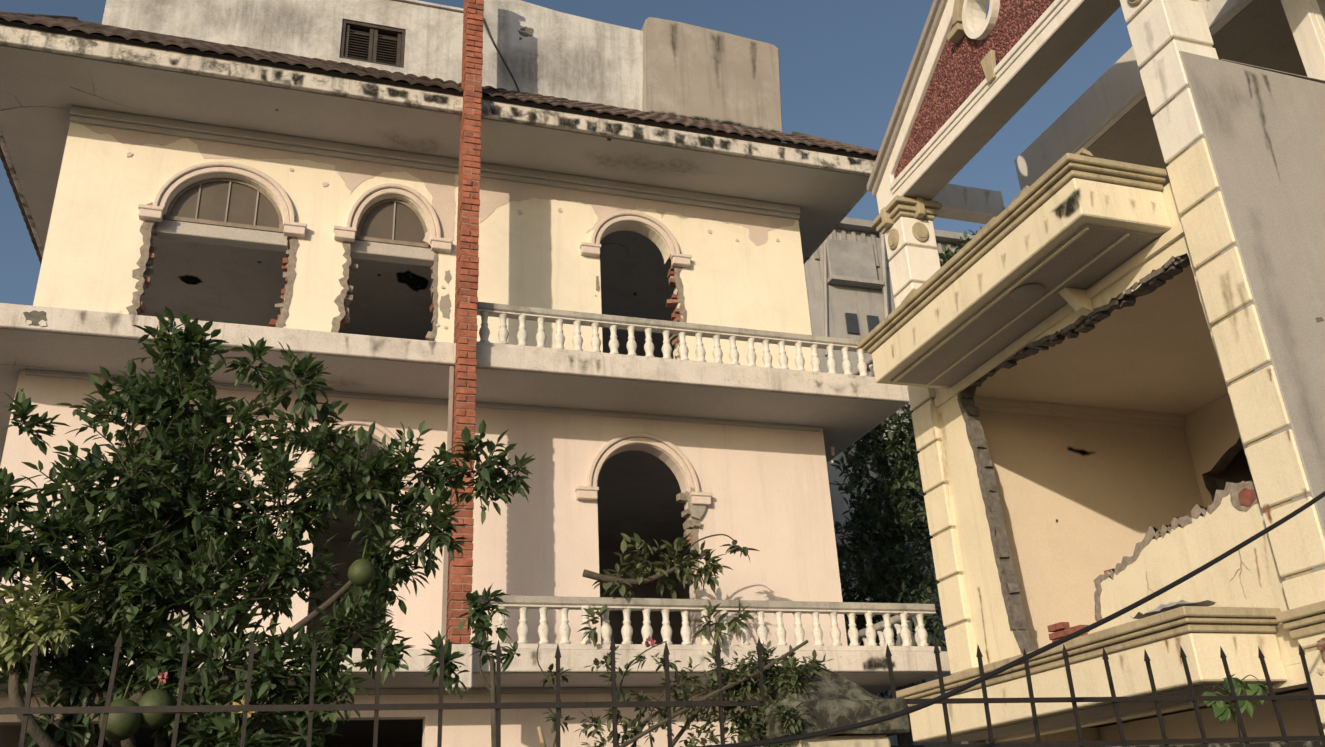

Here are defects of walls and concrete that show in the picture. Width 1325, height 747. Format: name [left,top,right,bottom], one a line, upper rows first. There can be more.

peeling [78,123,456,341]
peeling [479,177,795,246]
spalling [23,310,47,327]
spalling [666,252,687,359]
spalling [957,256,1190,631]
spalling [1093,480,1259,621]